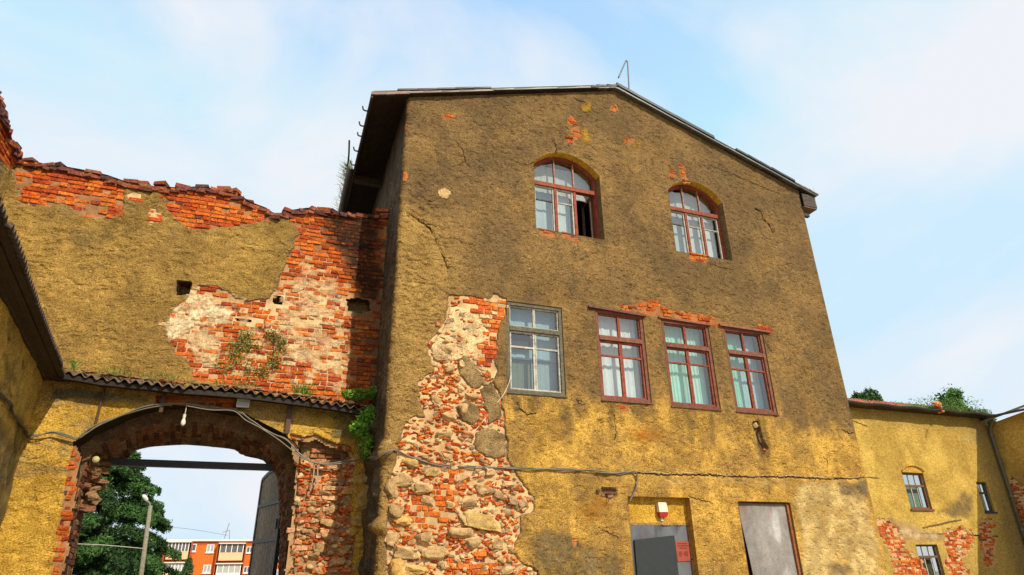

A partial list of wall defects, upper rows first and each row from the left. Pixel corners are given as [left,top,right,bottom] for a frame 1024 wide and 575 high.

flaking render [565,114,582,144]
flaking render [0,91,389,410]
crack [407,213,448,267]
flaking render [619,299,724,330]
flaking render [384,295,537,575]
flaking render [52,446,82,575]
flaking render [284,436,368,575]
peeling [797,481,996,575]